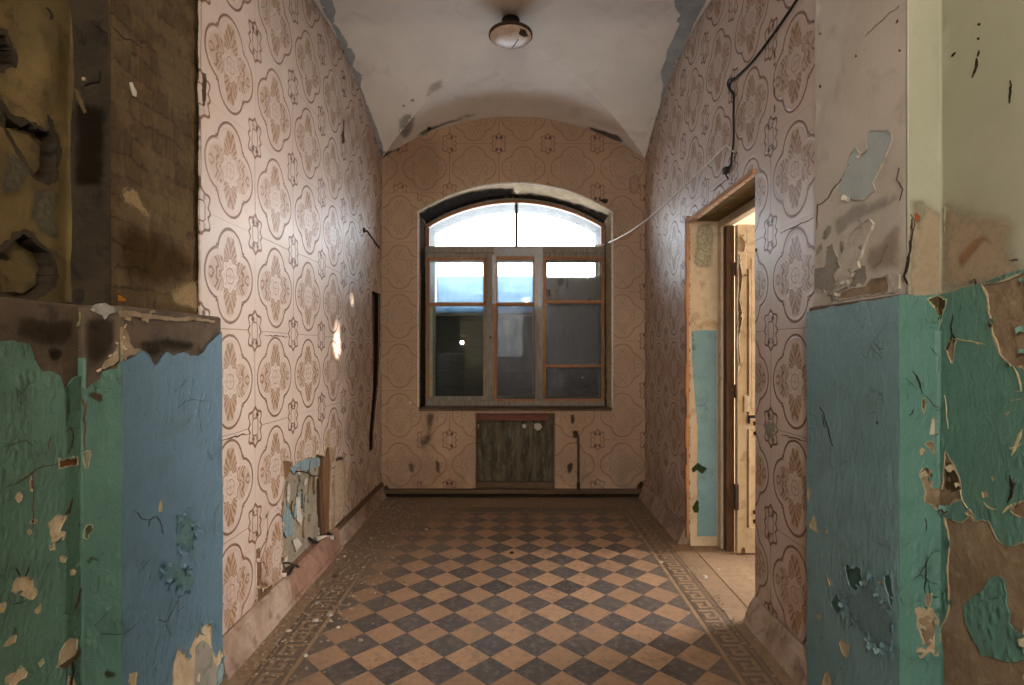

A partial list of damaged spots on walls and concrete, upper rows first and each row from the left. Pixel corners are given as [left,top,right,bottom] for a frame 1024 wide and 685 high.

spalling [0,99,62,186]
damp [77,106,102,183]
spalling [0,229,59,300]
peeling [813,219,900,304]
crack [873,168,915,285]
spalling [73,288,215,372]
spalling [981,272,1024,370]
peeling [27,515,77,576]
spalling [256,445,344,602]
spalling [915,398,1024,685]
peeling [4,638,80,685]
peeling [172,619,225,685]